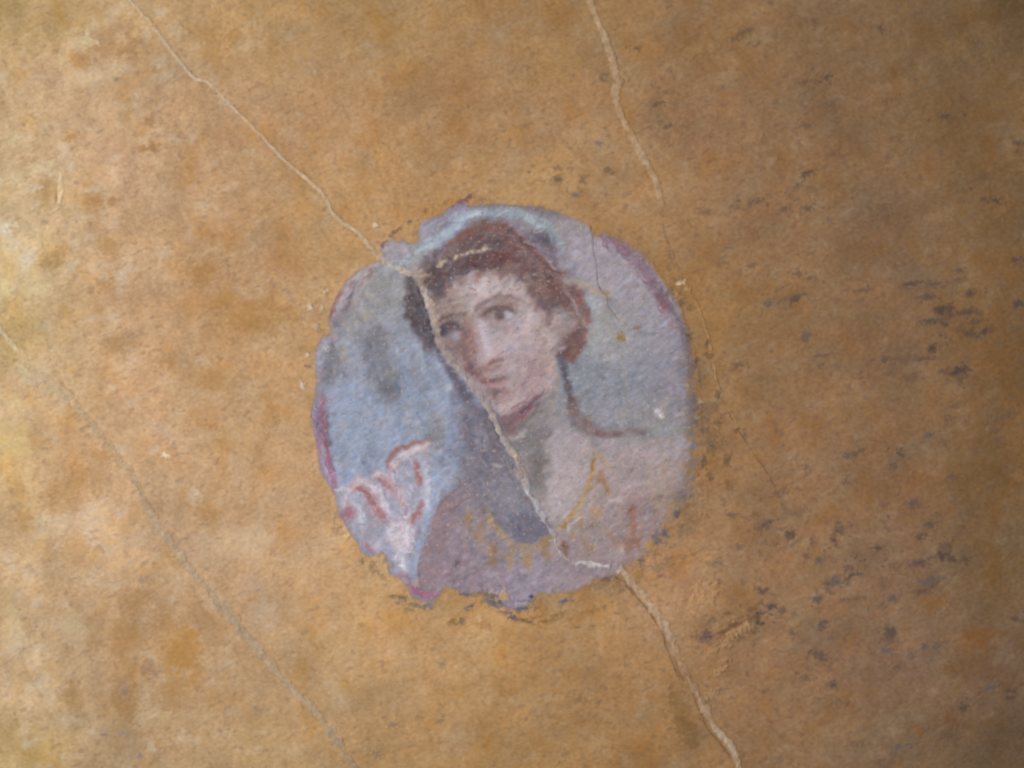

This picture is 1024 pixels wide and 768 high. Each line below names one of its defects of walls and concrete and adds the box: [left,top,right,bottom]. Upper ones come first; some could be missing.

crack [0,324,359,768]
crack [128,0,742,768]
crack [585,0,781,496]